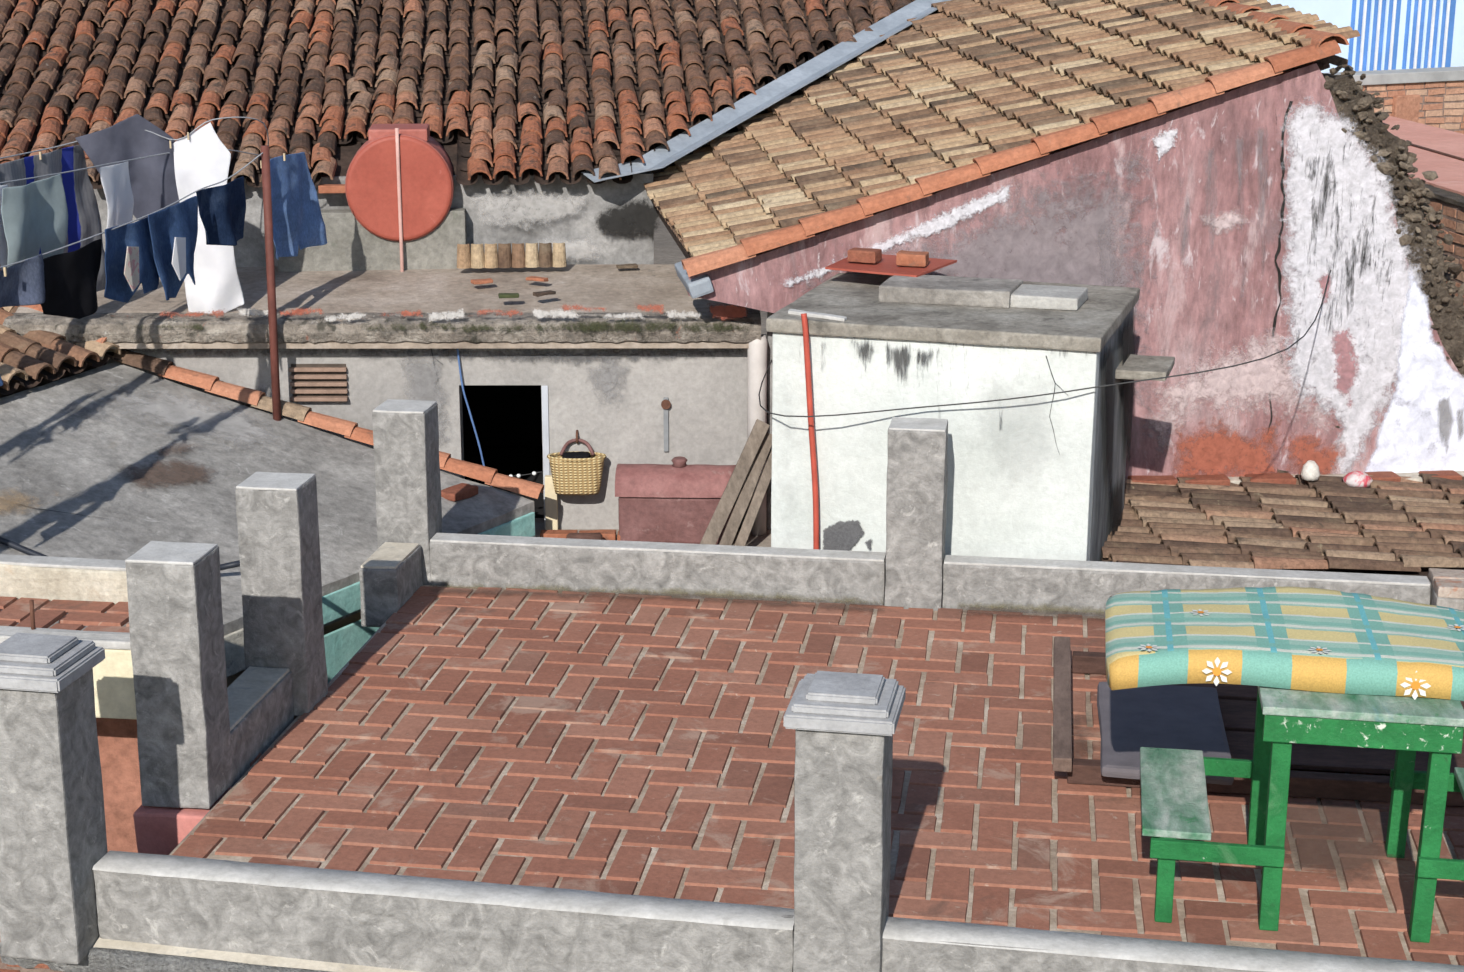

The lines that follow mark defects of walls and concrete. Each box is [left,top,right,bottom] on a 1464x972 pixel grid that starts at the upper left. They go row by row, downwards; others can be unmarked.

peeling [872,186,1010,252]
peeling [785,259,834,287]
crack [1267,101,1293,442]
peeling [1148,104,1464,477]
water stain [859,342,932,377]